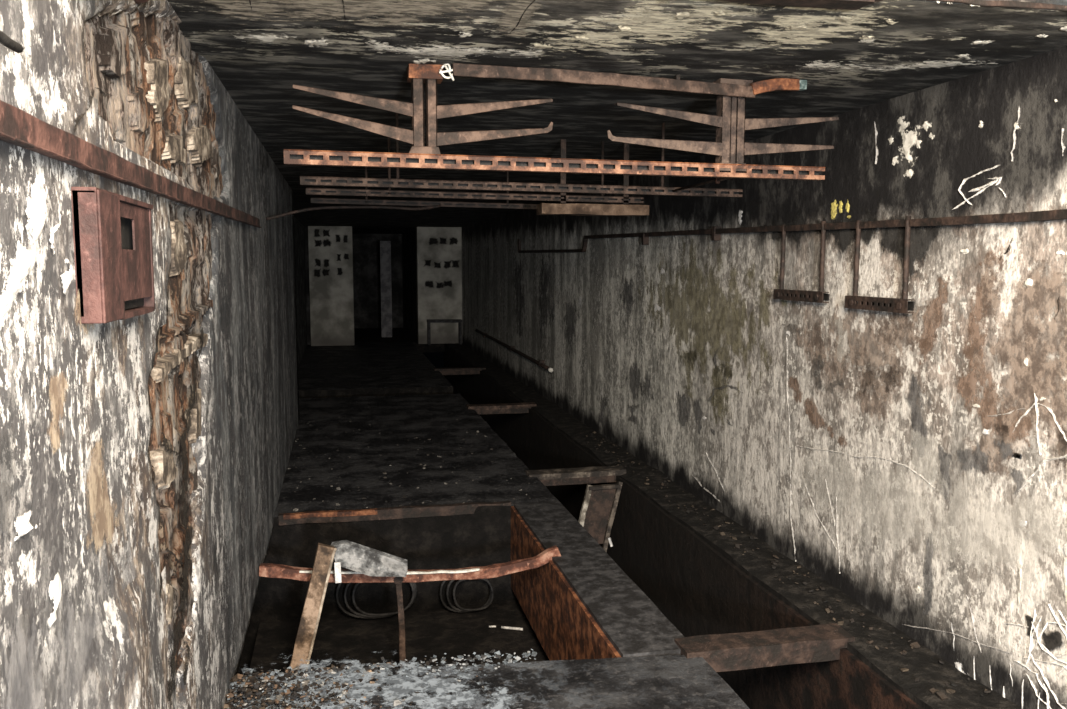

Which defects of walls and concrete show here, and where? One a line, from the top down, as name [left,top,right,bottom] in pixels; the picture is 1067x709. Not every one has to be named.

leakage [201,0,543,44]
spalling [84,8,223,198]
peeling [888,116,935,178]
spalling [148,202,213,693]
rust [788,376,847,446]
rust [795,275,951,419]